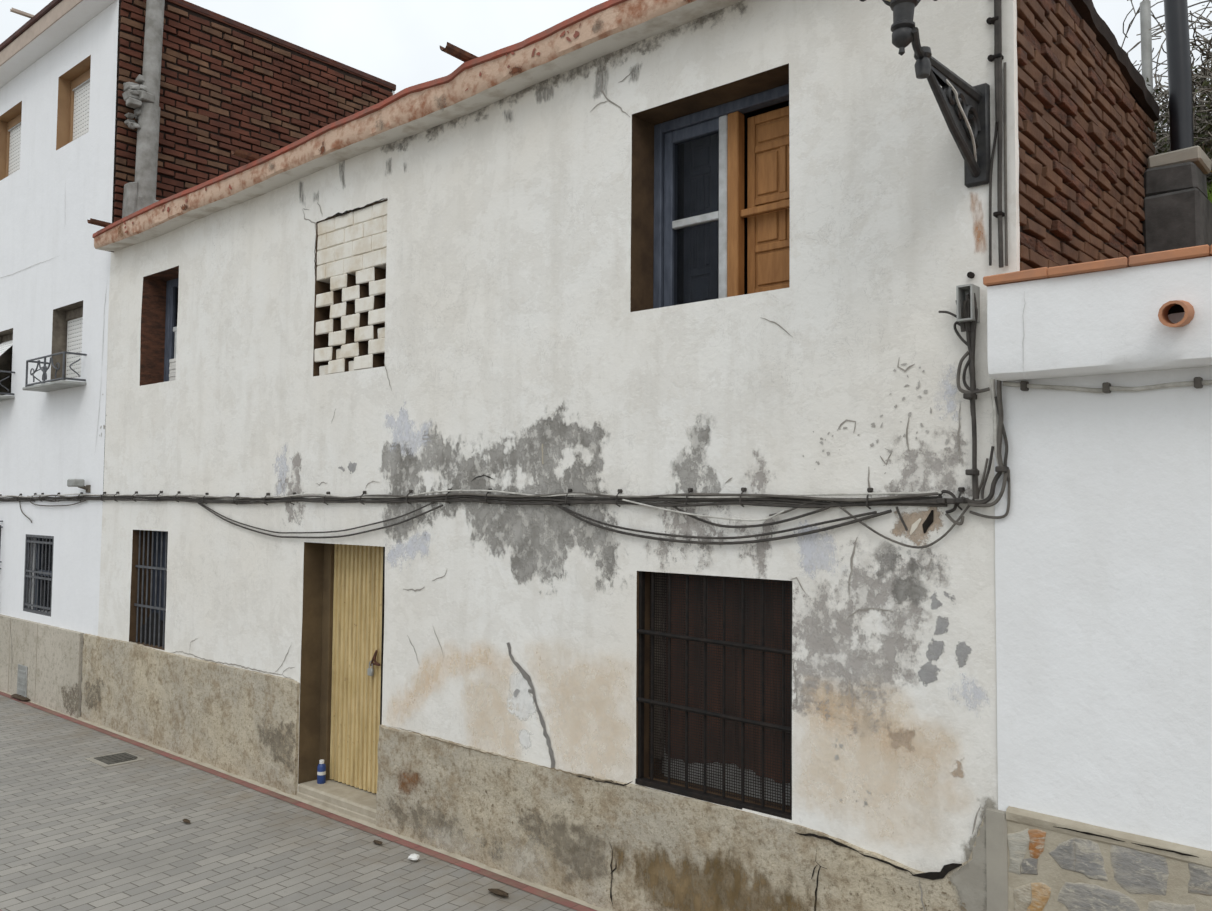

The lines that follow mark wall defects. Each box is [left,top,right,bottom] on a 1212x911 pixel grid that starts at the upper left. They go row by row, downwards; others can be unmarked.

leakage [476,40,658,120]
peeling [381,403,618,594]
peeling [647,421,724,567]
peeling [740,518,775,574]
peeling [751,452,766,494]
peeling [803,363,973,496]
peeling [792,507,971,751]
crack [393,642,631,786]
crack [608,840,617,904]
leakage [426,814,818,911]
crack [795,832,962,911]